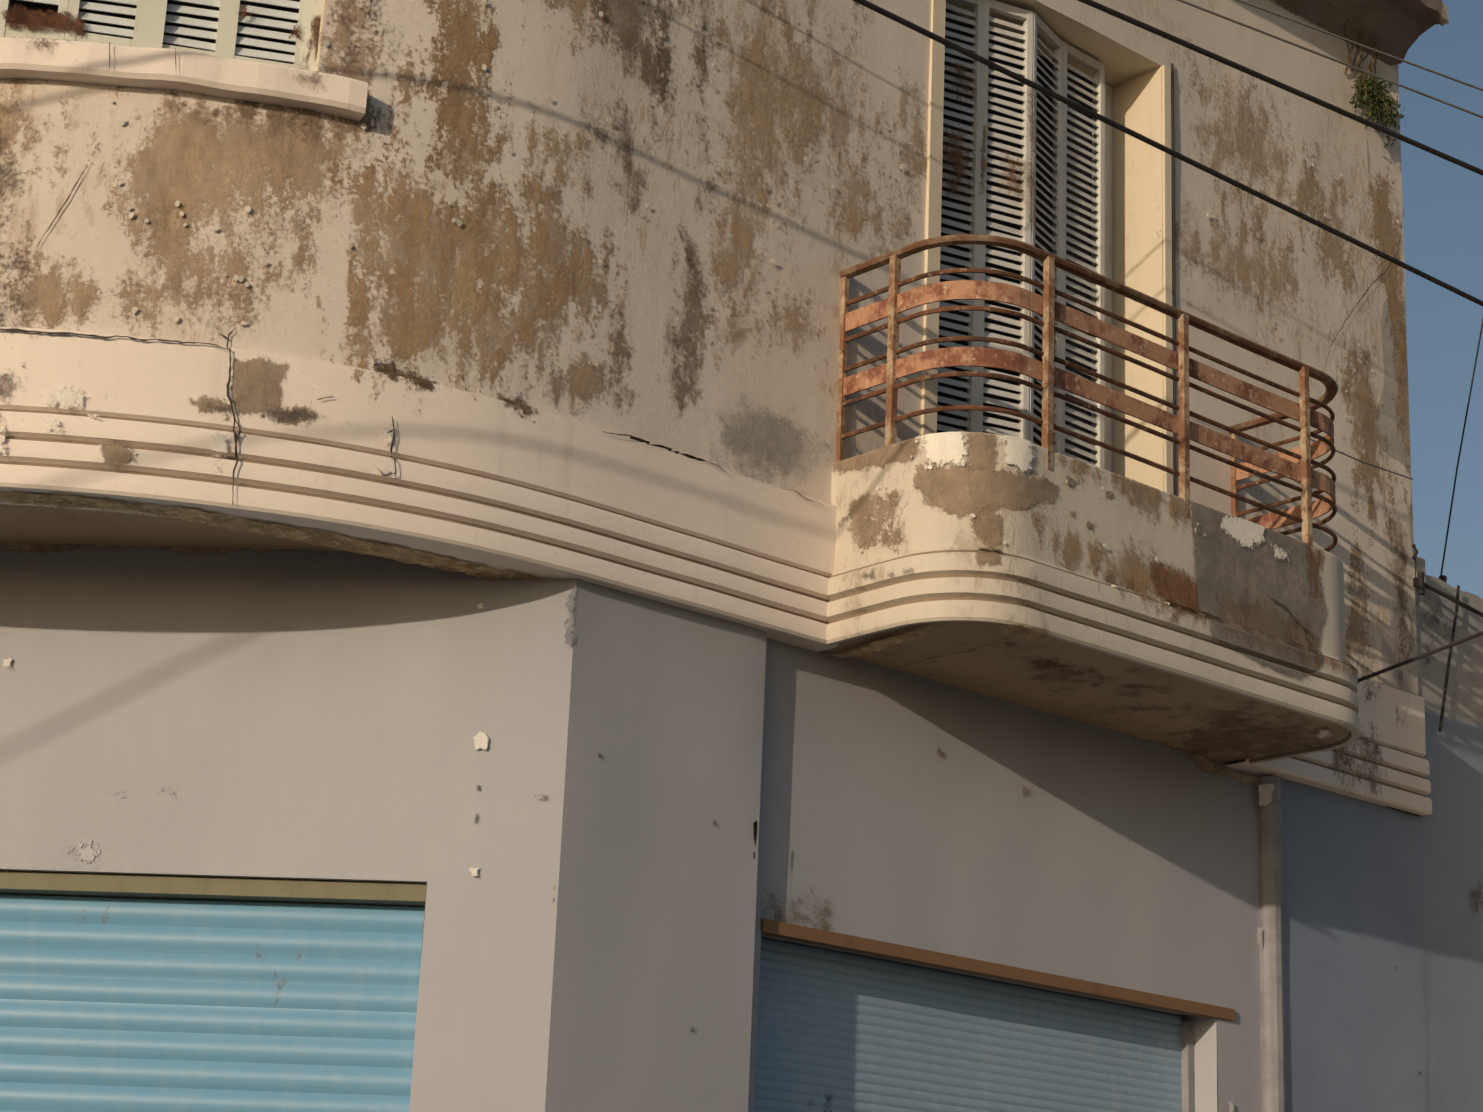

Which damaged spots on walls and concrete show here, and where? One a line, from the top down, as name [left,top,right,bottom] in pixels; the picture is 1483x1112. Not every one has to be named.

peeling [0,0,927,425]
peeling [1175,38,1412,524]
peeling [44,382,101,439]
crack [0,328,241,505]
peeling [209,430,229,469]
water stain [270,408,316,424]
spalling [0,490,542,581]
spalling [996,624,1055,639]
peeling [832,431,1289,623]
water stain [1191,501,1326,679]
peeling [1345,534,1372,684]
peeling [472,731,489,750]